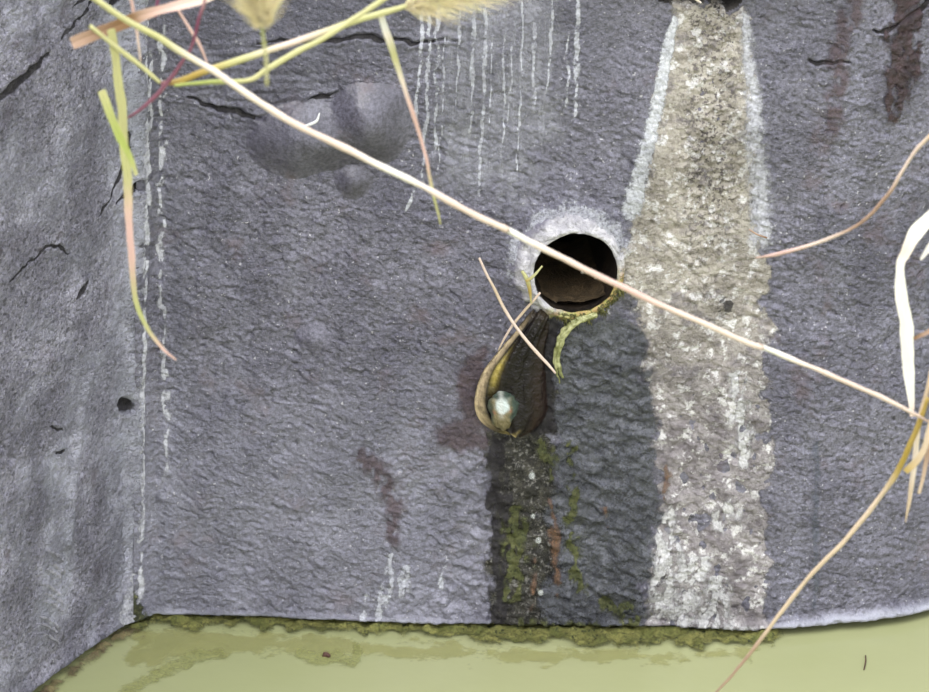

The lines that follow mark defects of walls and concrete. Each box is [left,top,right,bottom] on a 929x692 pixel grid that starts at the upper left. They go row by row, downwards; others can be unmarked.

crack [99,131,136,216]
crack [256,34,457,46]
water stain [414,0,446,181]
water stain [455,0,555,196]
water stain [565,0,581,117]
spalling [620,0,778,630]
water stain [484,313,755,631]